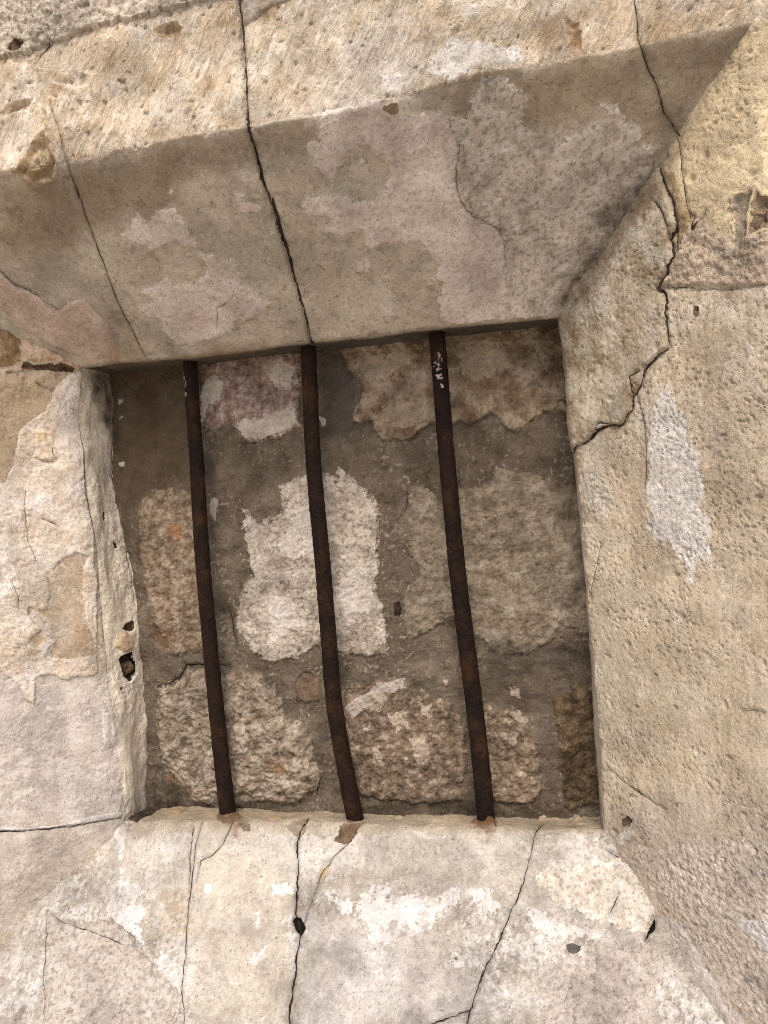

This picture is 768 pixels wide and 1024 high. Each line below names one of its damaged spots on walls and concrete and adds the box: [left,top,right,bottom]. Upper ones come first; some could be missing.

crack [239,3,312,343]
peeling [296,0,660,392]
crack [574,0,743,490]
peeling [120,617,137,636]
peeling [262,588,306,646]
peeling [278,497,315,566]
peeling [324,462,348,544]
peeling [332,557,379,631]
crack [181,821,234,1007]
crack [288,819,357,1024]
corrosion [340,817,371,838]
crack [432,824,544,1024]